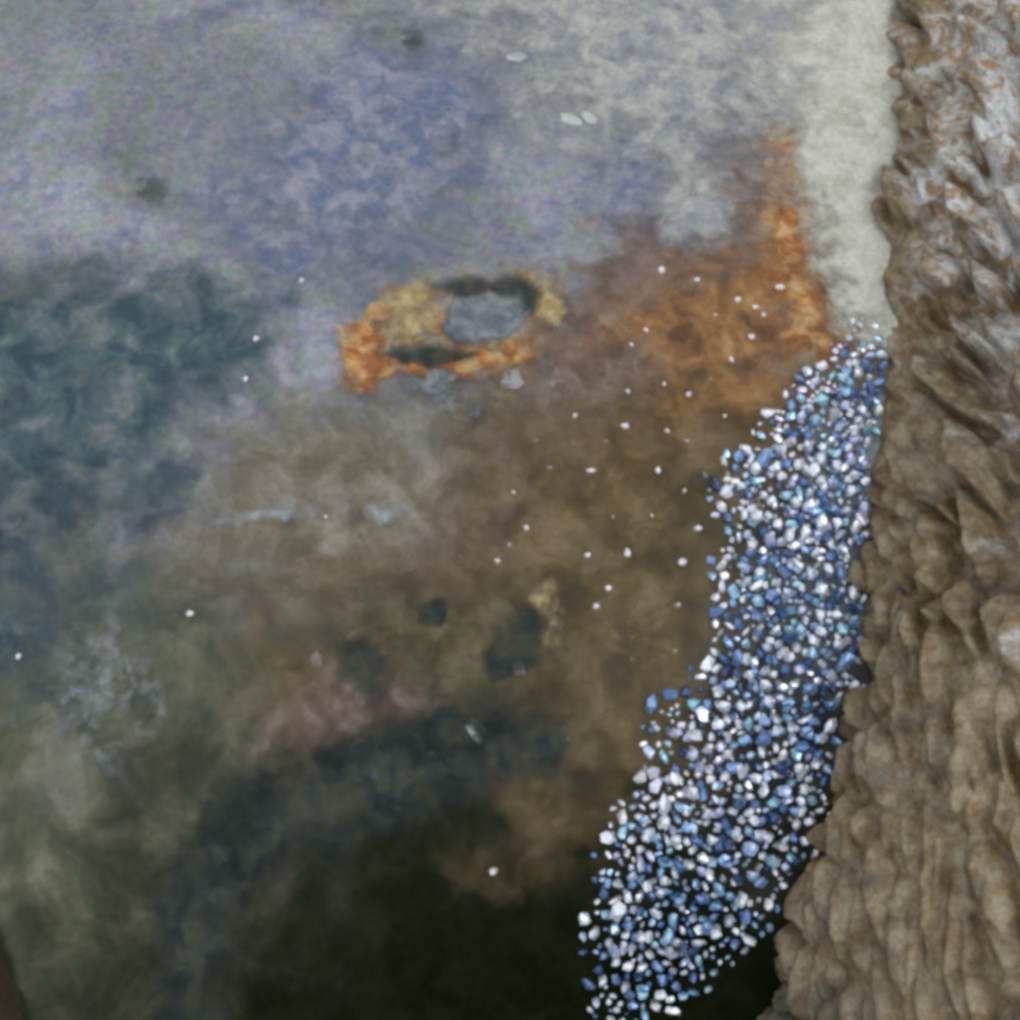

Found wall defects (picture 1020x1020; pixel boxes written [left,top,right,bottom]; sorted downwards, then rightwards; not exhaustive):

peeling [462,0,909,348]
damp [0,257,273,528]
spalling [338,269,563,410]
corrosion [421,124,874,762]
damp [0,530,59,666]